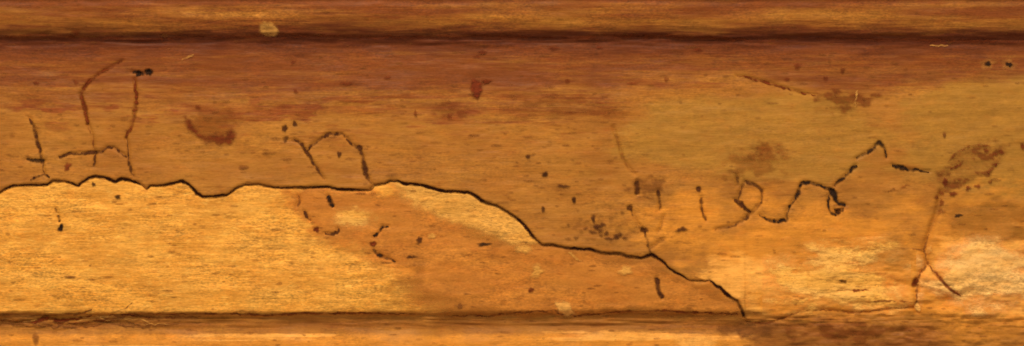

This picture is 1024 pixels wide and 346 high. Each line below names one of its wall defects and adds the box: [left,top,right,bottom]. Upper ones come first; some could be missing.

water stain [186,120,235,144]
crack [0,61,745,317]
crack [696,141,929,228]
crack [853,236,961,311]
crack [1,303,403,329]